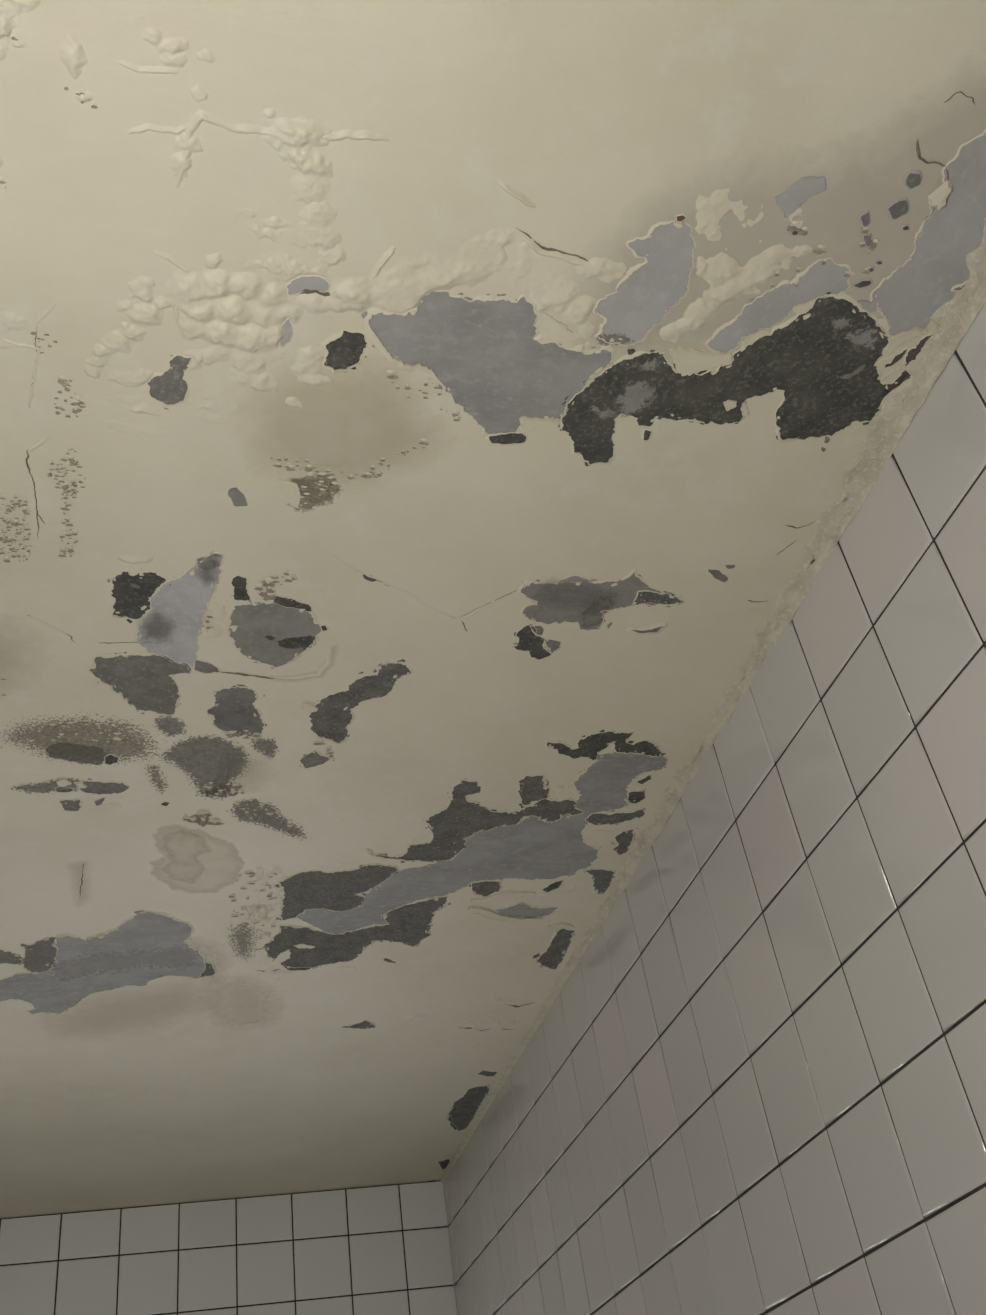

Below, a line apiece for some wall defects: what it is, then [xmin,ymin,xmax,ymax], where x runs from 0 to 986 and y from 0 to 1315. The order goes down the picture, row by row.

flaking render [279,129,986,466]
peeling [0,495,31,562]
peeling [227,486,248,507]
peeling [85,551,329,741]
peeling [512,568,685,660]
flaking render [299,659,414,769]
damp [1,713,305,841]
flaking render [239,729,669,986]
peeling [0,910,216,1014]
peeling [447,1070,498,1131]